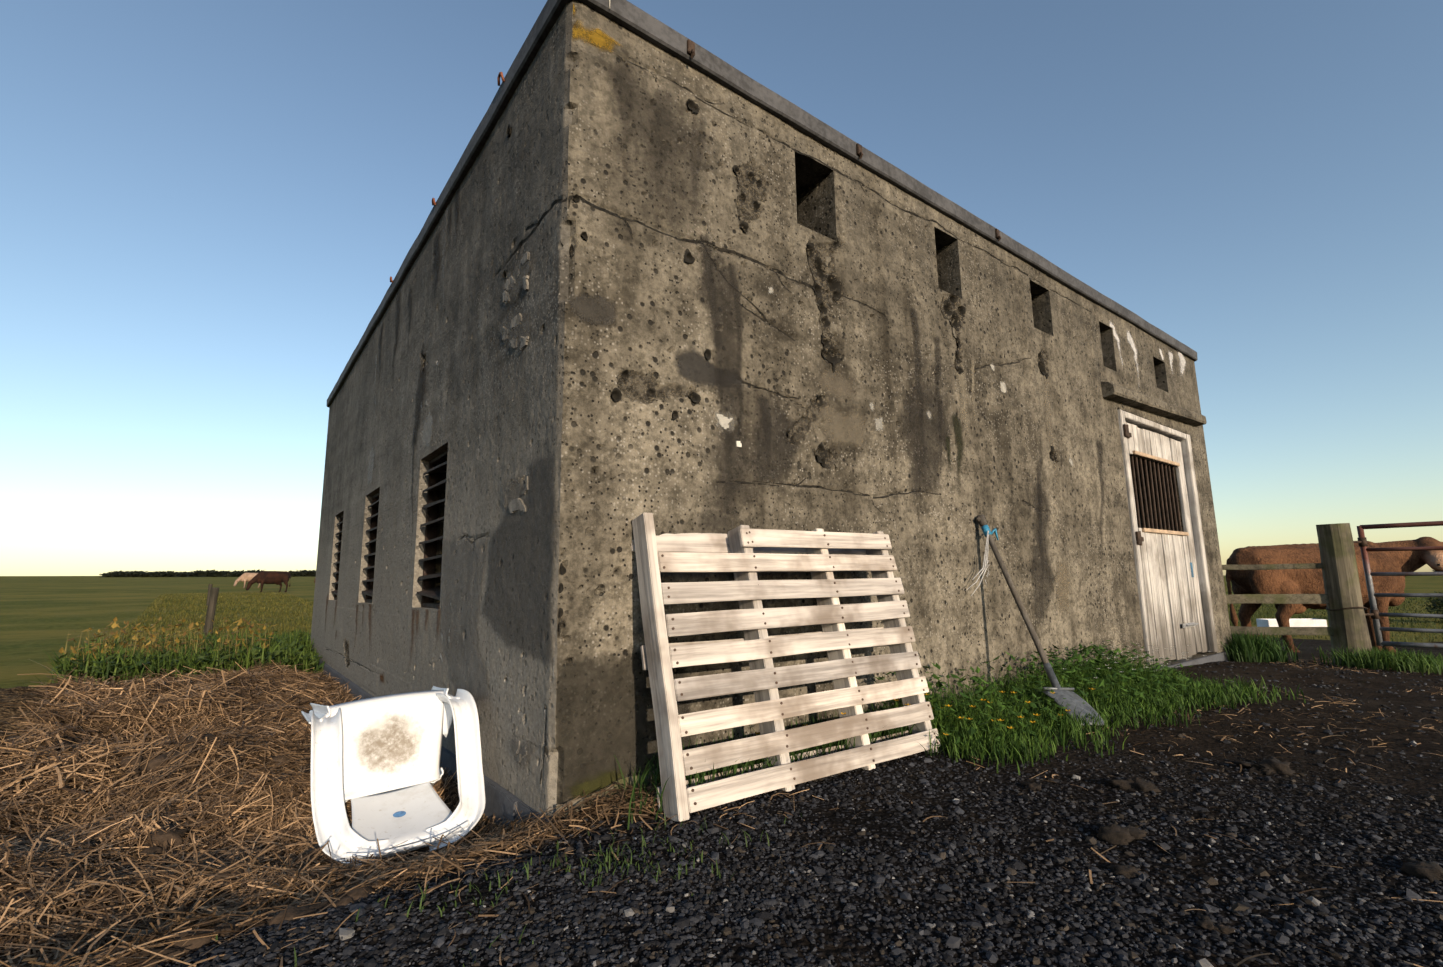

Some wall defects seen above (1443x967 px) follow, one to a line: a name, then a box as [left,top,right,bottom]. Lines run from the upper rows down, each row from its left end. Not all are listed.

spalling [733,156,766,234]
crack [586,41,1092,313]
peeling [500,252,531,351]
crack [495,195,886,341]
spalling [806,236,844,372]
crack [737,378,806,409]
crack [717,478,939,513]